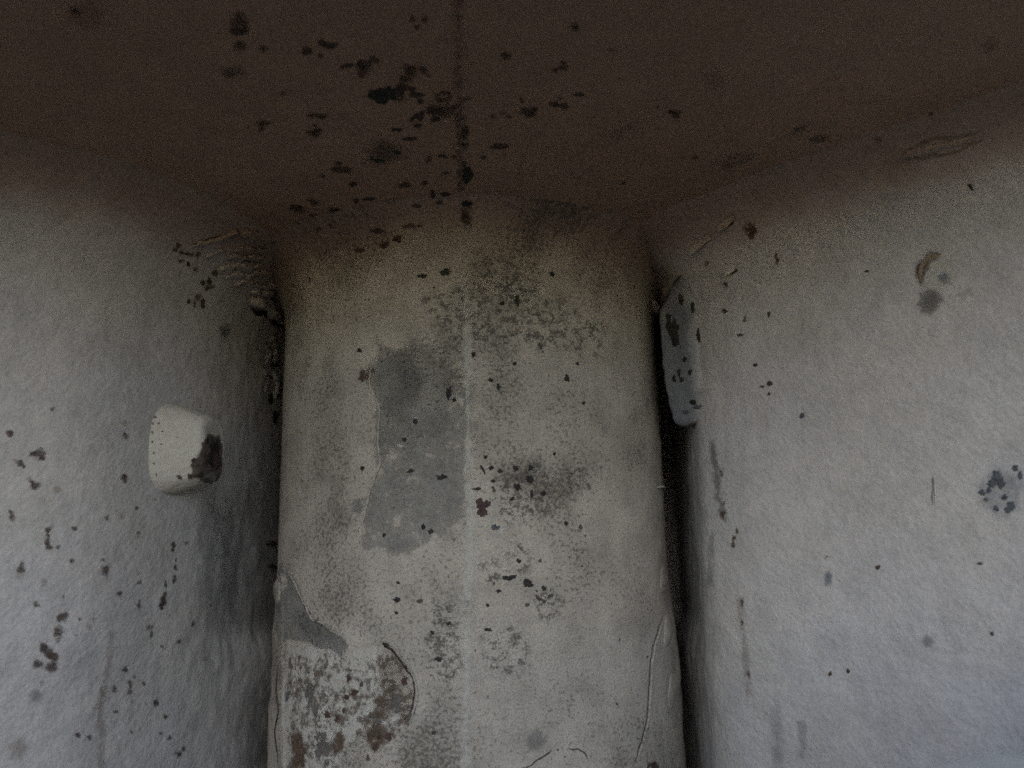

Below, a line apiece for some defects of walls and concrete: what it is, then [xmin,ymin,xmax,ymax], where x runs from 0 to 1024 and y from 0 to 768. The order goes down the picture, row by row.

water stain [916,252,953,314]
spalling [176,434,223,484]
water stain [417,258,603,768]
spalling [274,564,418,768]
crack [635,615,665,765]